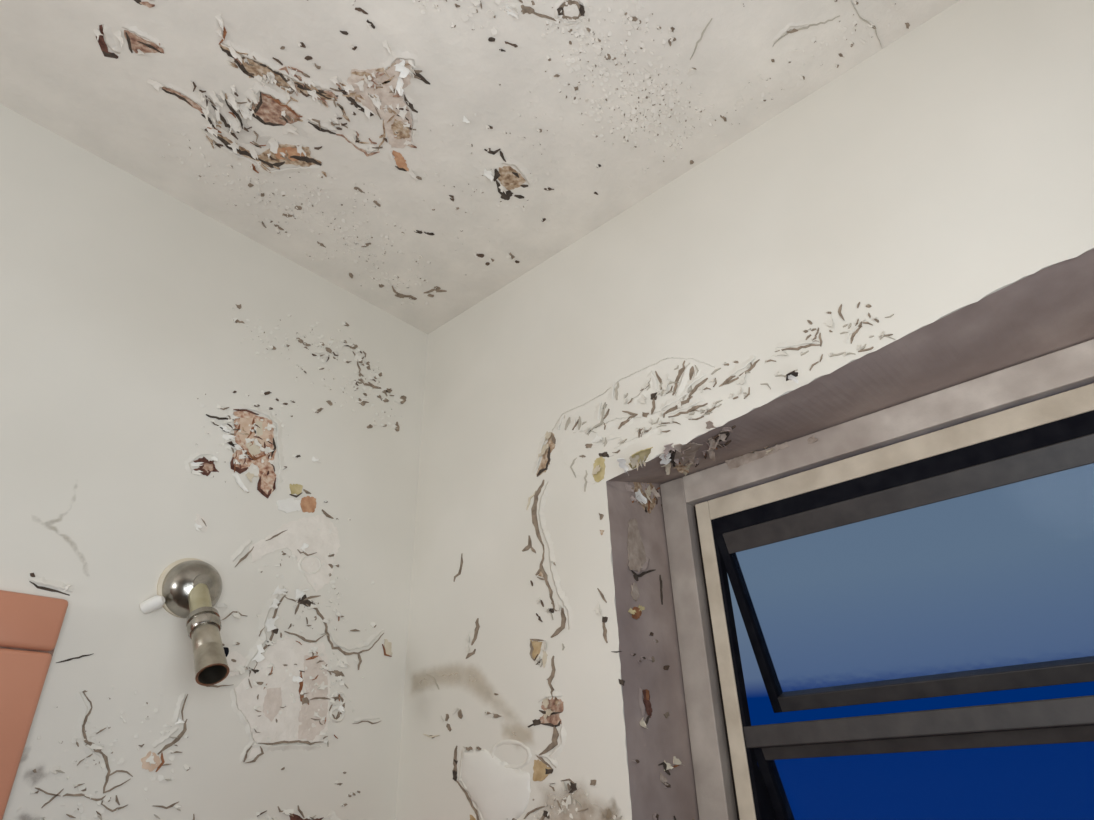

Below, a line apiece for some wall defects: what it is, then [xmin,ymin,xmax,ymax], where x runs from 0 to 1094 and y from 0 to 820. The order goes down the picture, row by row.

spalling [93,23,165,59]
spalling [157,14,562,305]
peeling [231,304,406,432]
crack [56,653,94,663]
spalling [184,390,350,534]
spalling [206,546,355,763]
crack [284,589,393,674]
crack [465,618,480,659]
crack [522,480,622,667]
peeling [532,421,790,605]
crack [16,686,190,820]
crack [452,746,484,820]